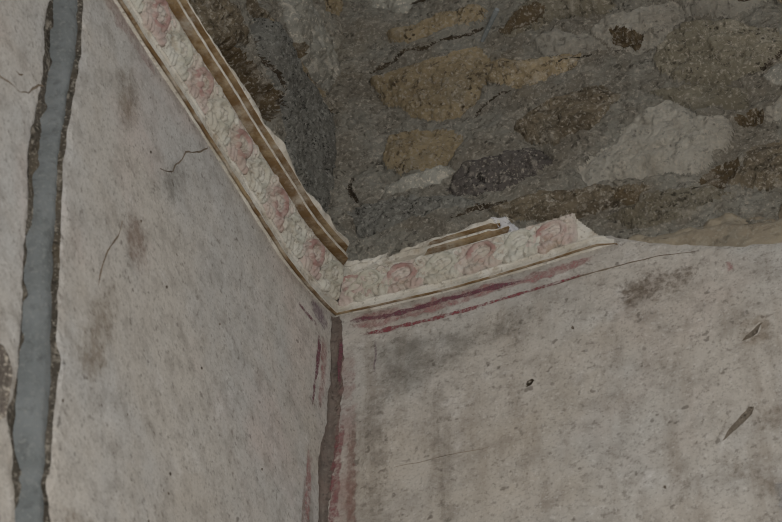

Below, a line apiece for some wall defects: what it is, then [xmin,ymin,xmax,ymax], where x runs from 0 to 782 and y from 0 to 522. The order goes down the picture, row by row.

crack [0,72,44,94]
crack [160,148,208,172]
spalling [189,0,782,261]
spalling [0,0,83,522]
crack [98,220,123,285]
spalling [722,406,754,441]